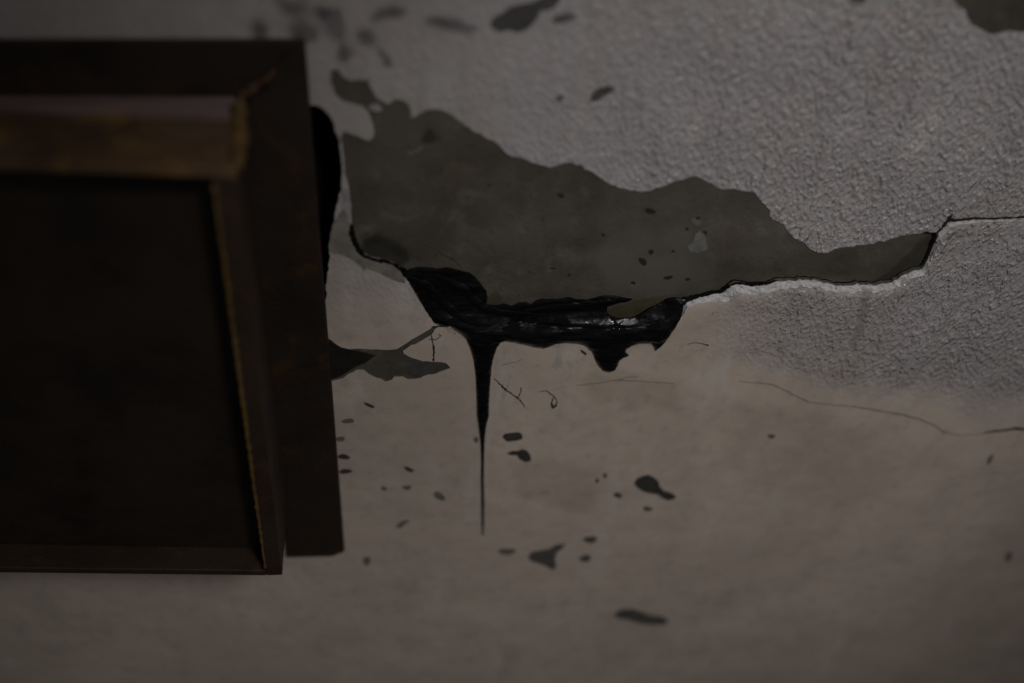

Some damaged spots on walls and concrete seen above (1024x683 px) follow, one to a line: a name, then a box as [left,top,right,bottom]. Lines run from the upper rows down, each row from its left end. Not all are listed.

peeling [954,0,1024,34]
flaking render [329,69,934,318]
crack [937,215,1024,233]
peeling [328,327,449,380]
leakage [348,224,781,535]